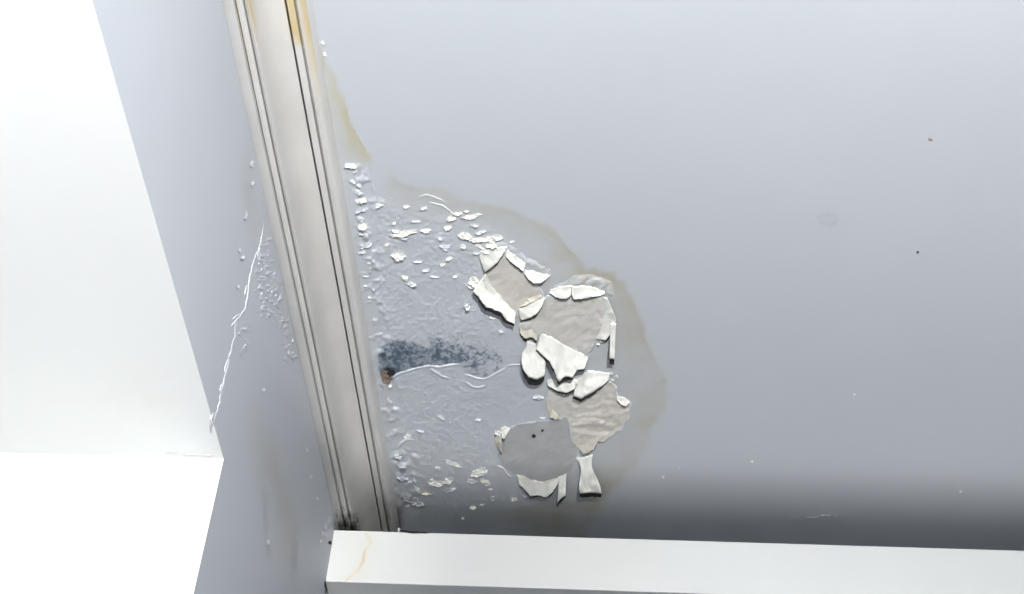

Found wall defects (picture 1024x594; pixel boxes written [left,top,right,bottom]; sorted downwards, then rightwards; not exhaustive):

crack [210,221,264,427]
water stain [380,347,521,389]
peeling [473,241,632,507]